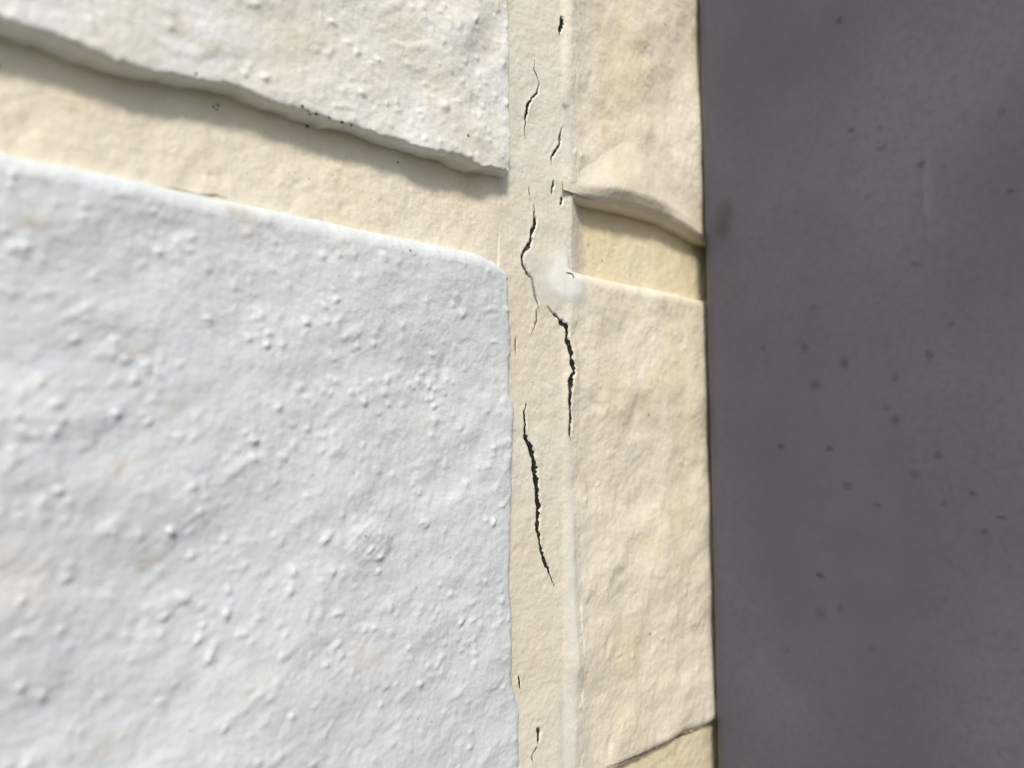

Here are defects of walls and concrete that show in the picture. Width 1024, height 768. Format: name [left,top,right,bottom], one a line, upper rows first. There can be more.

crack [524,60,540,132]
crack [515,125,578,440]
crack [523,404,555,586]